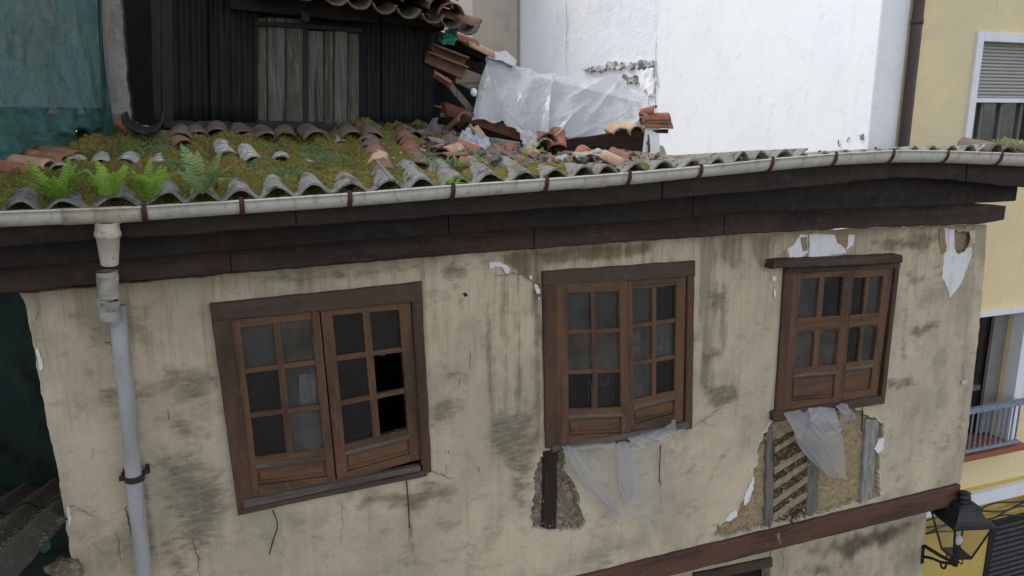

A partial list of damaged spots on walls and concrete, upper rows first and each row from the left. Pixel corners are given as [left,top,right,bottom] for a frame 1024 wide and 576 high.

flaking render [489,261,510,274]
flaking render [787,233,855,257]
flaking render [939,228,976,298]
flaking render [528,448,587,533]
flaking render [715,408,886,539]